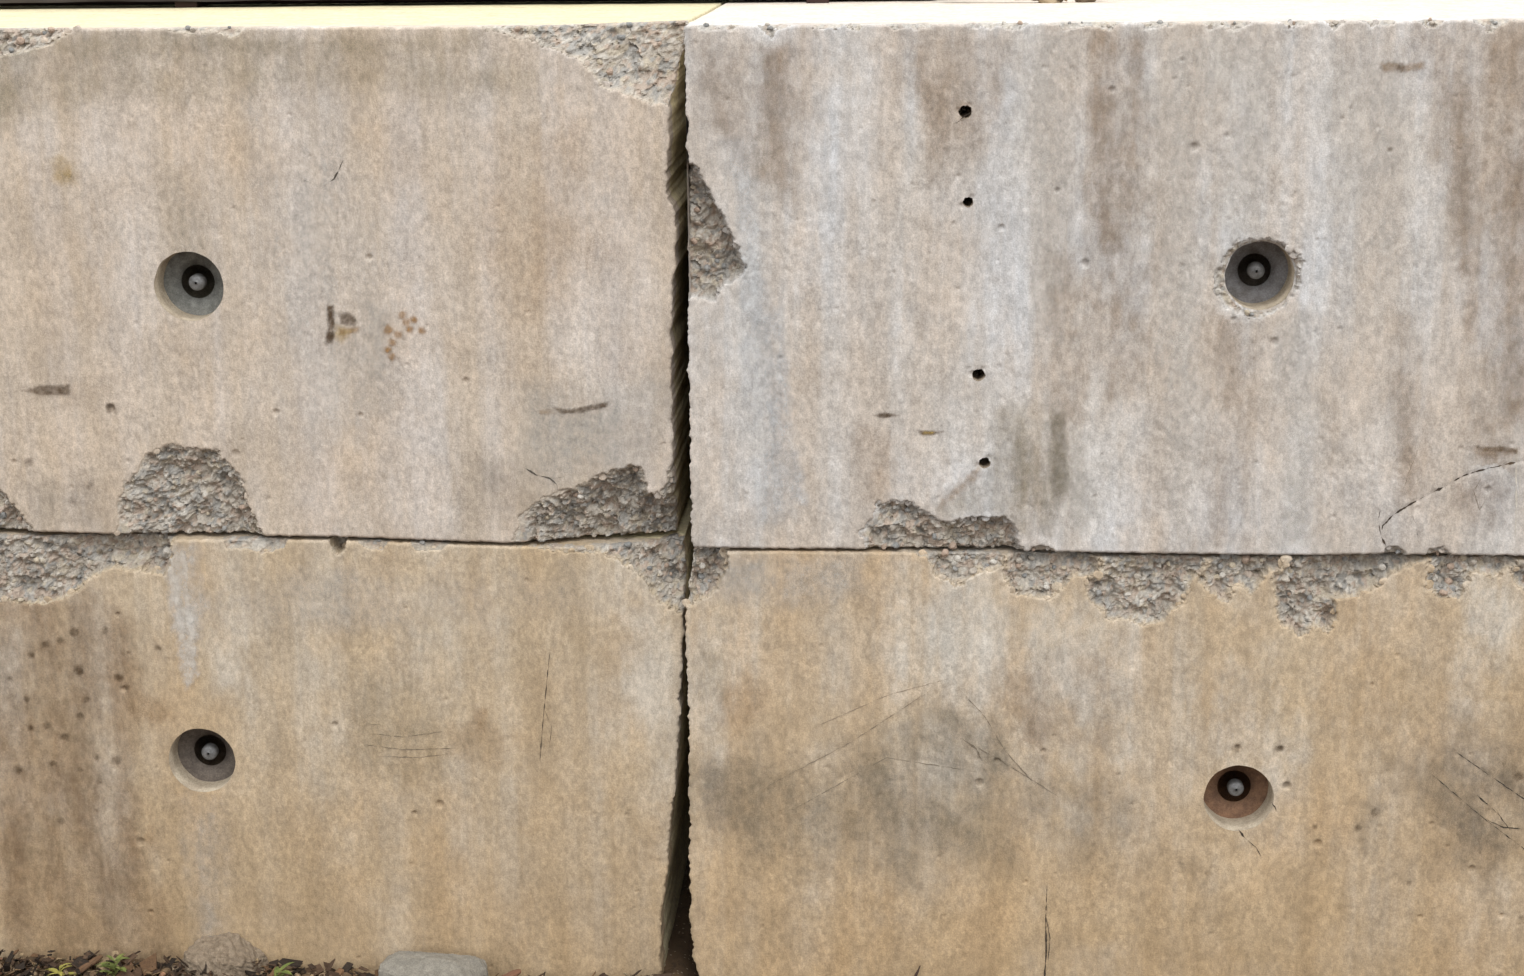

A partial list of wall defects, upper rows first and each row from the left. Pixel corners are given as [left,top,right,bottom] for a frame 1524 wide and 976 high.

spalling [480,20,791,107]
spalling [687,163,747,302]
spalling [0,443,293,606]
spalling [511,460,730,615]
spalling [858,499,1524,637]